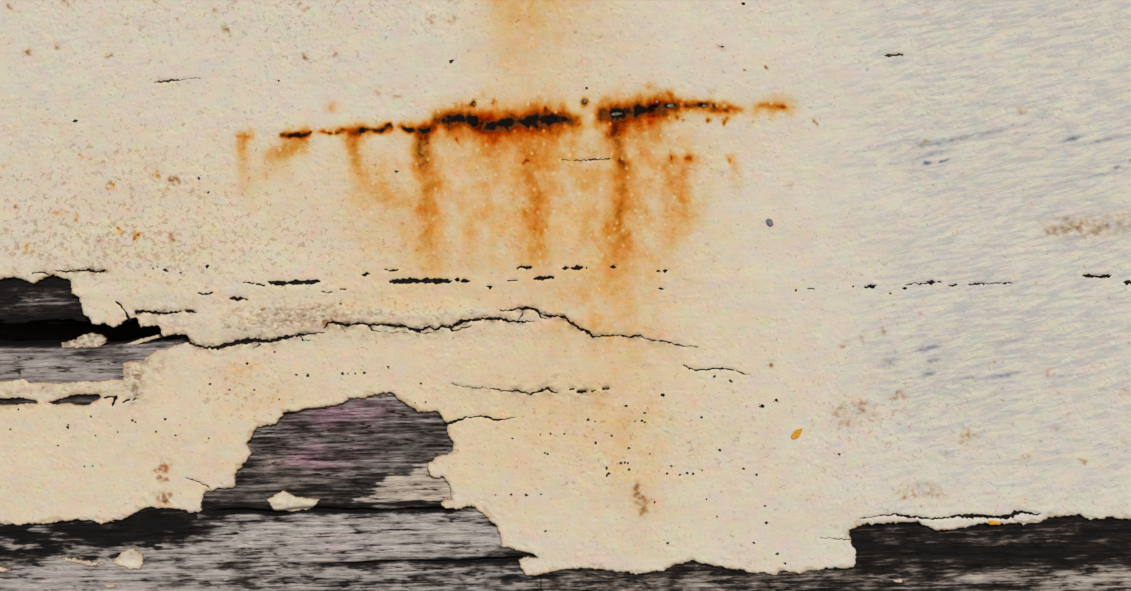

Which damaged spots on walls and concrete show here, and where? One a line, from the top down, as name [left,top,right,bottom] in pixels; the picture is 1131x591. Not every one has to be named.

rust [280,100,576,168]
rust [581,99,728,169]
peeling [0,275,190,417]
crack [115,265,750,375]
peeling [0,392,1131,591]